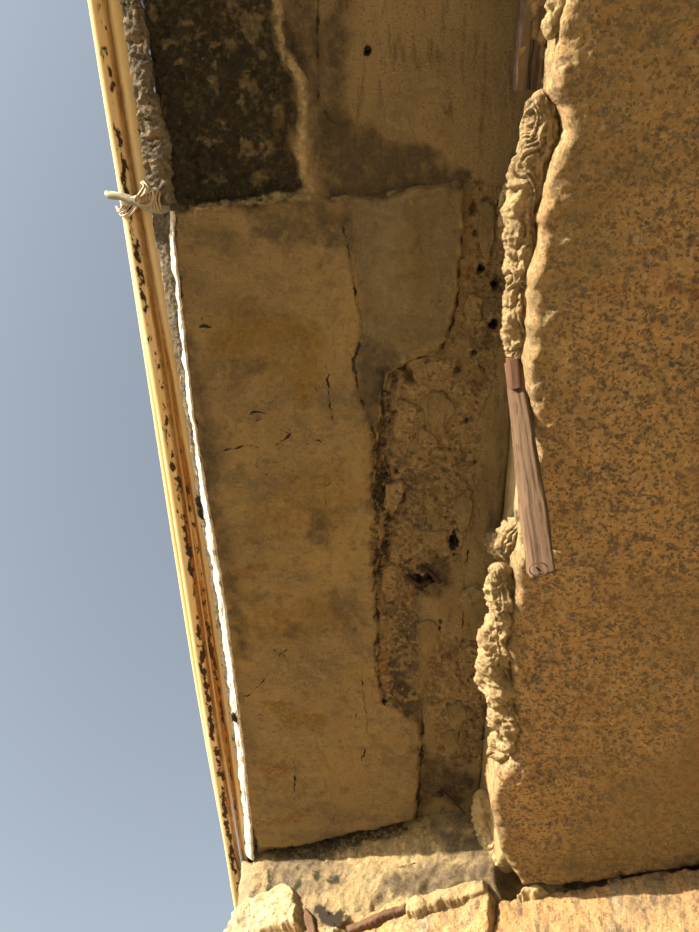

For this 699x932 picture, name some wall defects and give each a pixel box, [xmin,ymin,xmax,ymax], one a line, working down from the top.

leakage [139,0,469,210]
rust [148,280,244,860]
spalling [376,174,506,769]
leakage [272,854,317,889]
leakage [385,835,507,899]